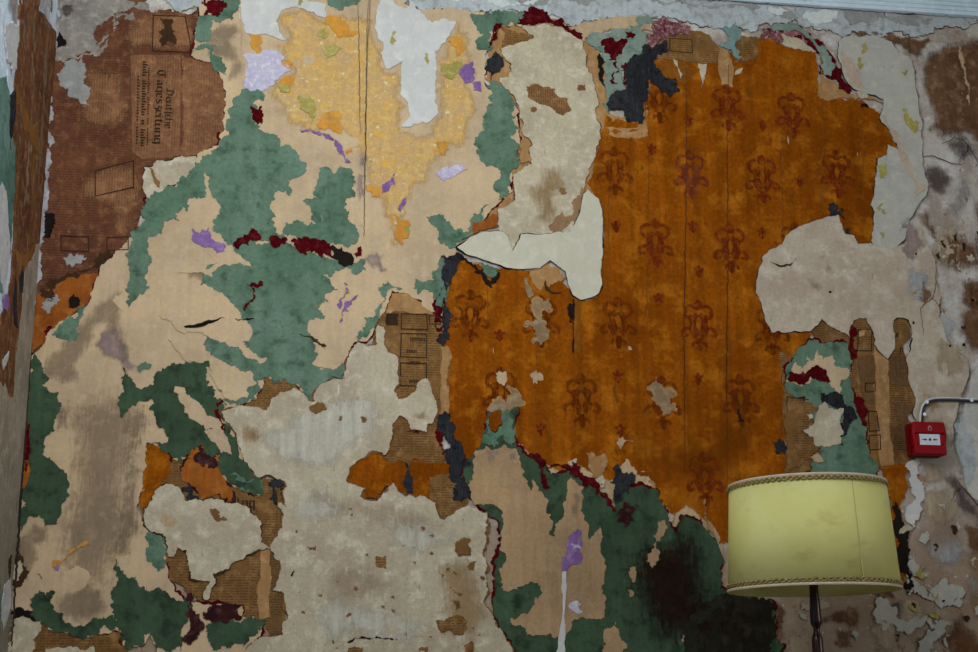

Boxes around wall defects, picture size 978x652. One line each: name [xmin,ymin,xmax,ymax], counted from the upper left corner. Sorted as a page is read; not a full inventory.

peeling [238,0,326,41]
peeling [57,57,91,106]
leakage [949,136,971,159]
leakage [926,167,949,193]
peeling [374,0,978,448]
leakage [932,179,975,271]
leakage [902,223,931,303]
leakage [963,280,978,305]
leakage [938,315,966,375]
peeling [0,213,95,652]
peeling [803,402,844,463]
peeling [143,324,514,652]